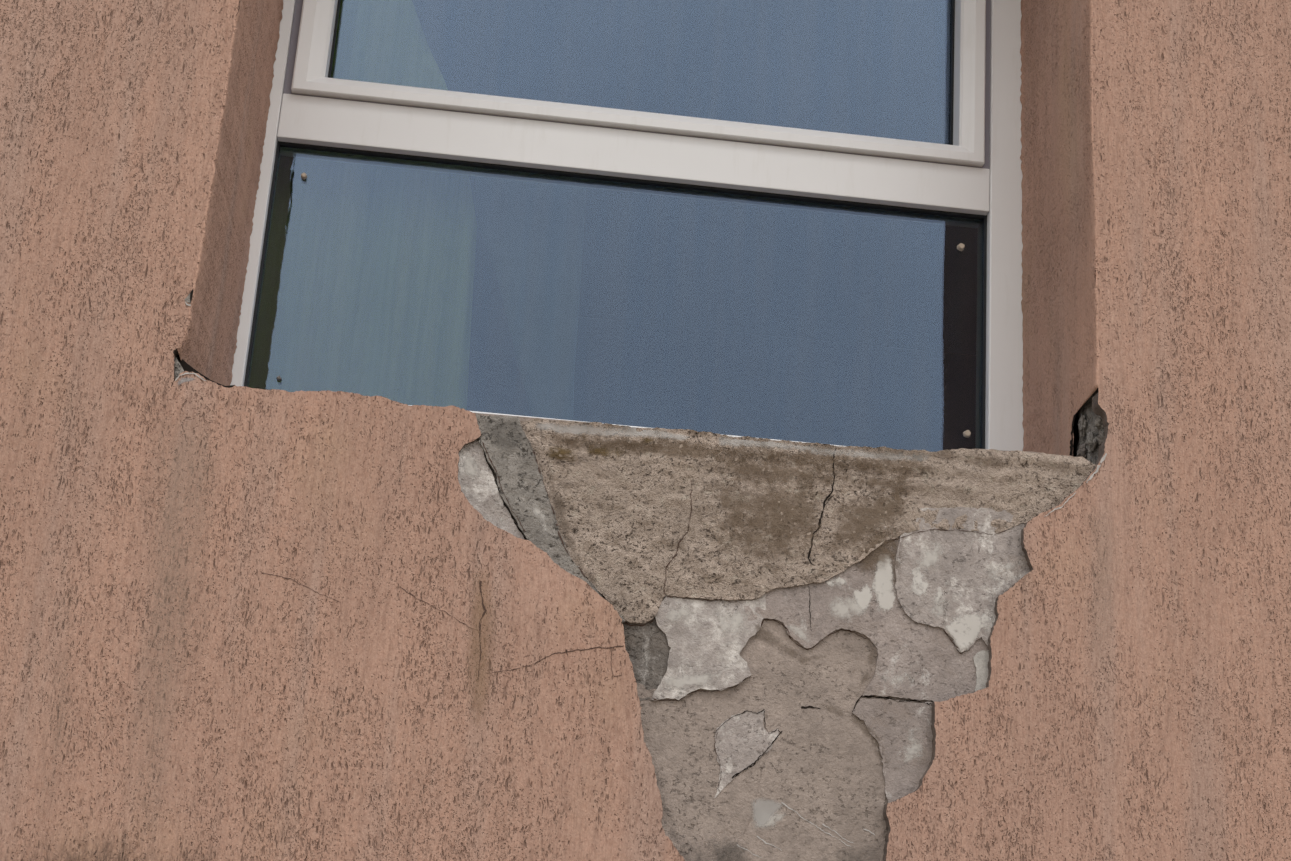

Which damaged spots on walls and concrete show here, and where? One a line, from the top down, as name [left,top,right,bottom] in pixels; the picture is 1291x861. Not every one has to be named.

crack [400,587,484,633]
crack [493,645,623,677]
spalling [458,388,1107,861]
crack [807,448,836,631]